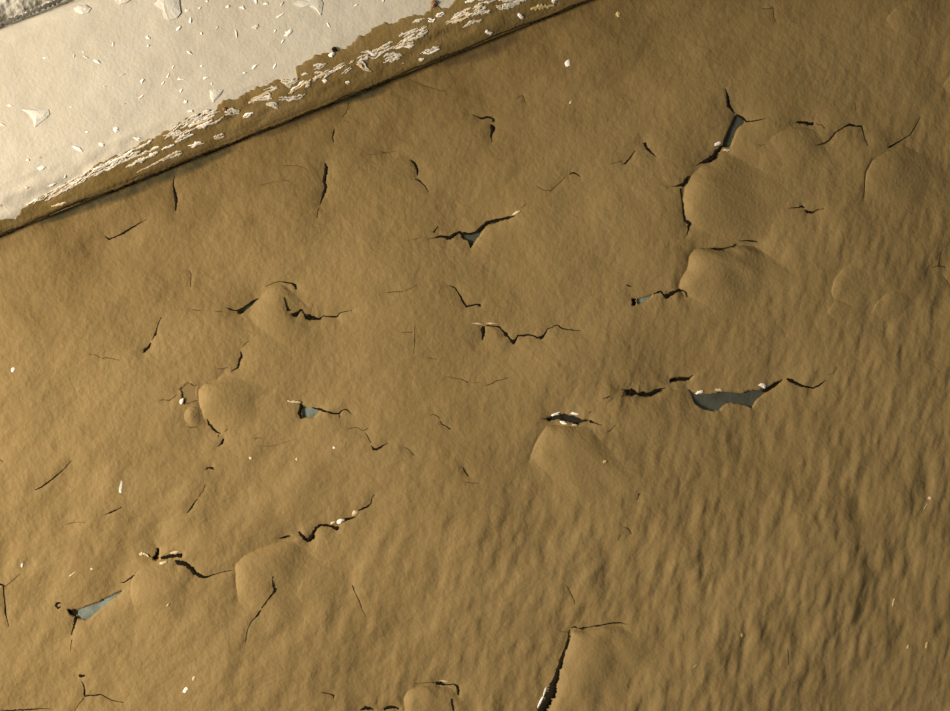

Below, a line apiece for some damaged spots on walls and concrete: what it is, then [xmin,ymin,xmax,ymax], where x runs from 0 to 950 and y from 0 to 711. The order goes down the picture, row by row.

peeling [26,0,557,207]
peeling [697,89,766,165]
peeling [430,210,520,247]
crack [267,281,352,320]
crack [448,285,578,344]
crack [603,388,664,399]
peeling [670,376,781,411]
peeling [544,411,612,432]
crack [279,495,374,543]
crack [175,560,232,578]
peeling [55,575,133,649]
crack [537,585,624,711]